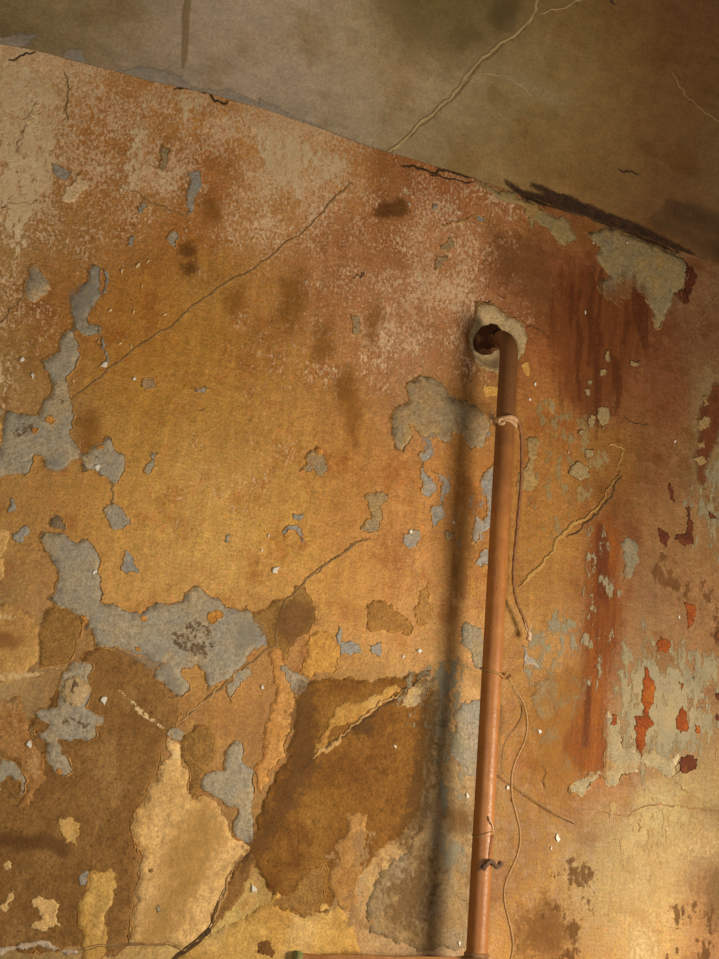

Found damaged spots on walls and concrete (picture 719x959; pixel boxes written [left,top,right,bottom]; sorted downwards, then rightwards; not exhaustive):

crack [384,0,581,184]
peeling [474,181,698,330]
peeling [0,263,126,485]
corrosion [551,270,649,425]
peeling [658,447,719,562]
spalling [0,375,493,958]
corrosion [565,519,624,772]
peeling [522,609,719,798]
peeling [679,602,697,628]
crack [0,850,255,959]
damp [629,924,679,959]
damp [668,875,719,959]